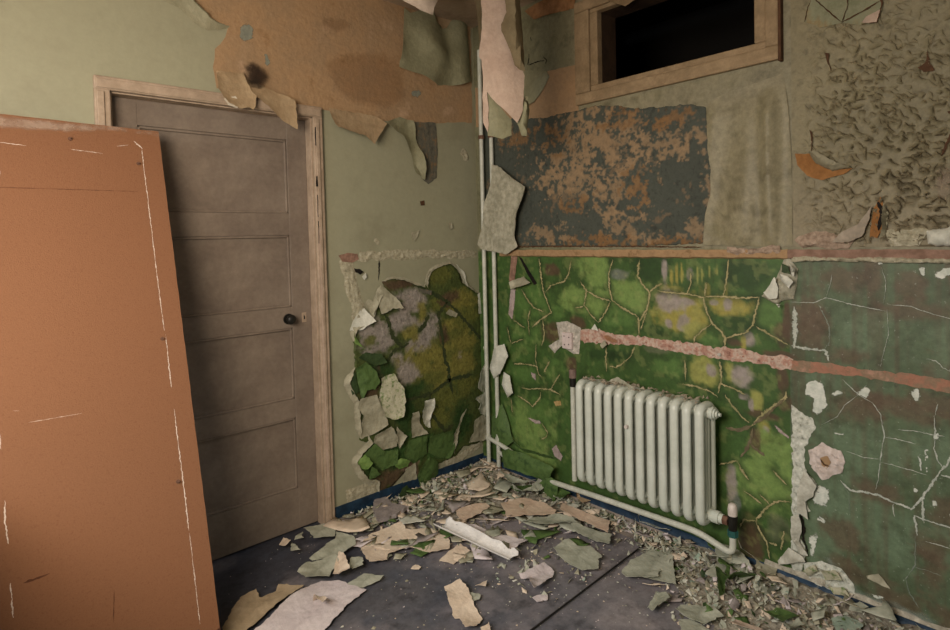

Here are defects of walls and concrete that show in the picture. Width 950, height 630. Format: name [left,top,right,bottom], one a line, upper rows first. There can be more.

peeling [791,0,950,247]
peeling [344,261,513,523]
peeling [439,544,470,564]
peeling [456,470,612,570]
crack [507,245,950,559]
flaking render [778,405,868,613]
crack [824,381,950,606]